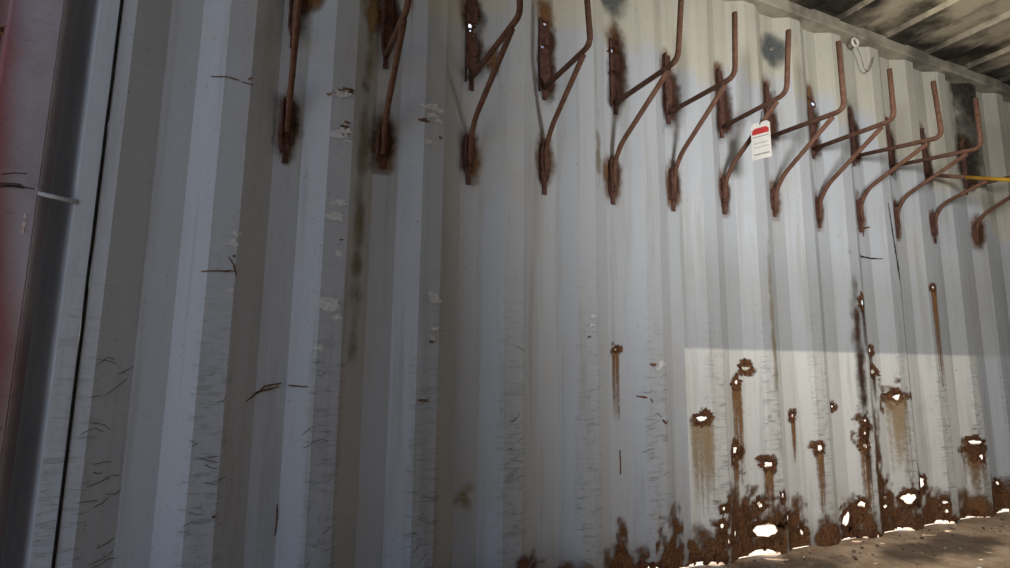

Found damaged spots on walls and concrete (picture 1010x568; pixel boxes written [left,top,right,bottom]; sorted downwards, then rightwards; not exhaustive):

rust [301,0,322,16]
rust [537,0,556,99]
rust [607,28,627,110]
rust [662,65,680,122]
rust [714,63,733,134]
rust [604,282,1010,568]
rust [517,554,537,568]